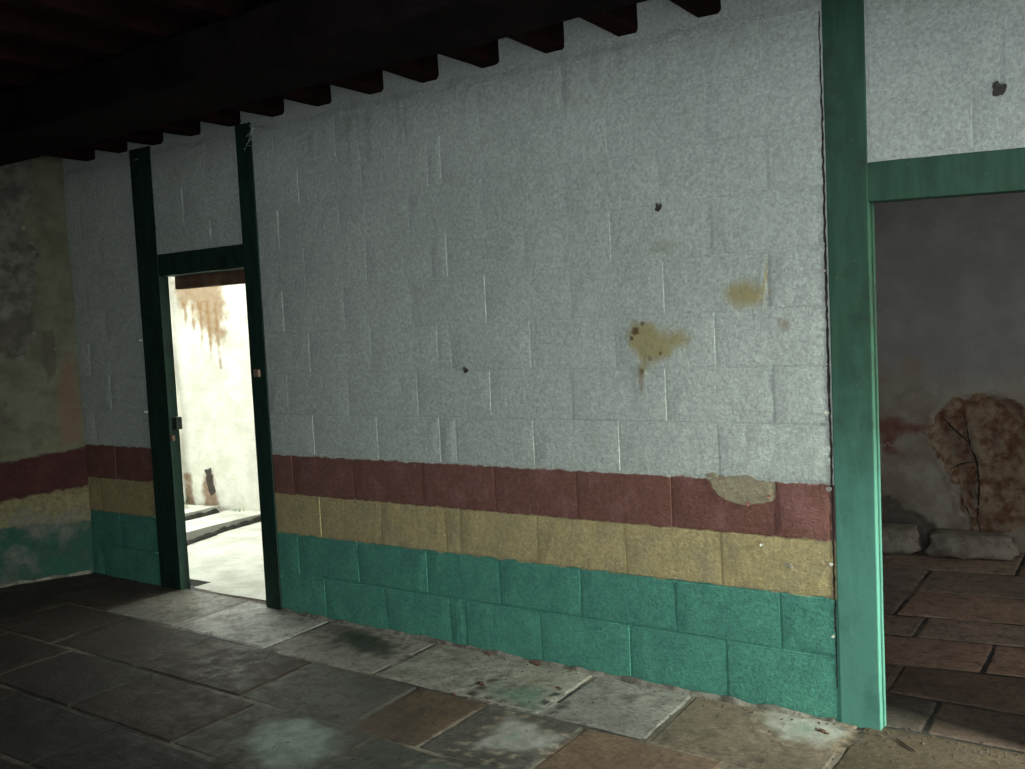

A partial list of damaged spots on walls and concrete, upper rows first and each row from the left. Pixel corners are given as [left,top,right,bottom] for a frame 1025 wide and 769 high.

rust [715,257,782,322]
rust [621,309,699,399]
peeling [702,470,836,543]
spalling [881,492,942,548]